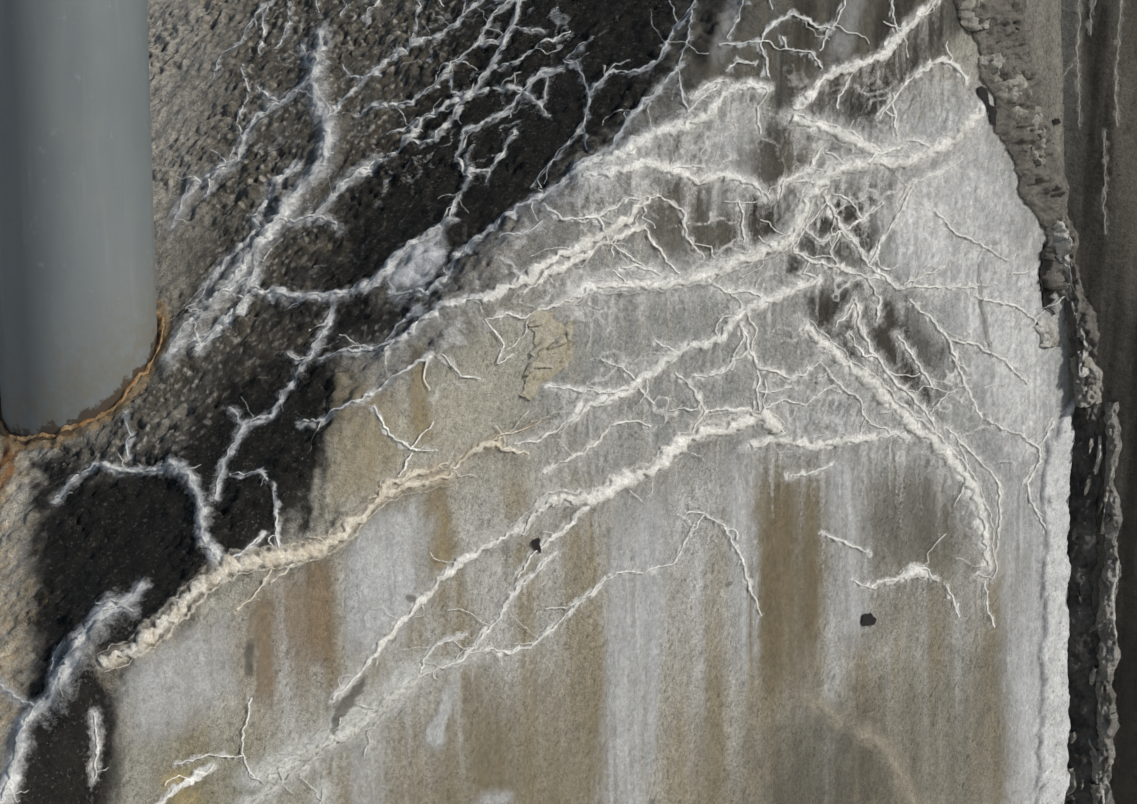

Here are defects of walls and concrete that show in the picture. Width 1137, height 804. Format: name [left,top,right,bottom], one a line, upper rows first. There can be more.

damp [653,0,946,292]
crack [977,86,997,124]
damp [1086,0,1112,290]
crack [979,261,994,358]
crack [1039,241,1057,315]
damp [784,288,939,451]
rust [0,440,21,490]
damp [1102,324,1137,804]
damp [165,775,195,804]